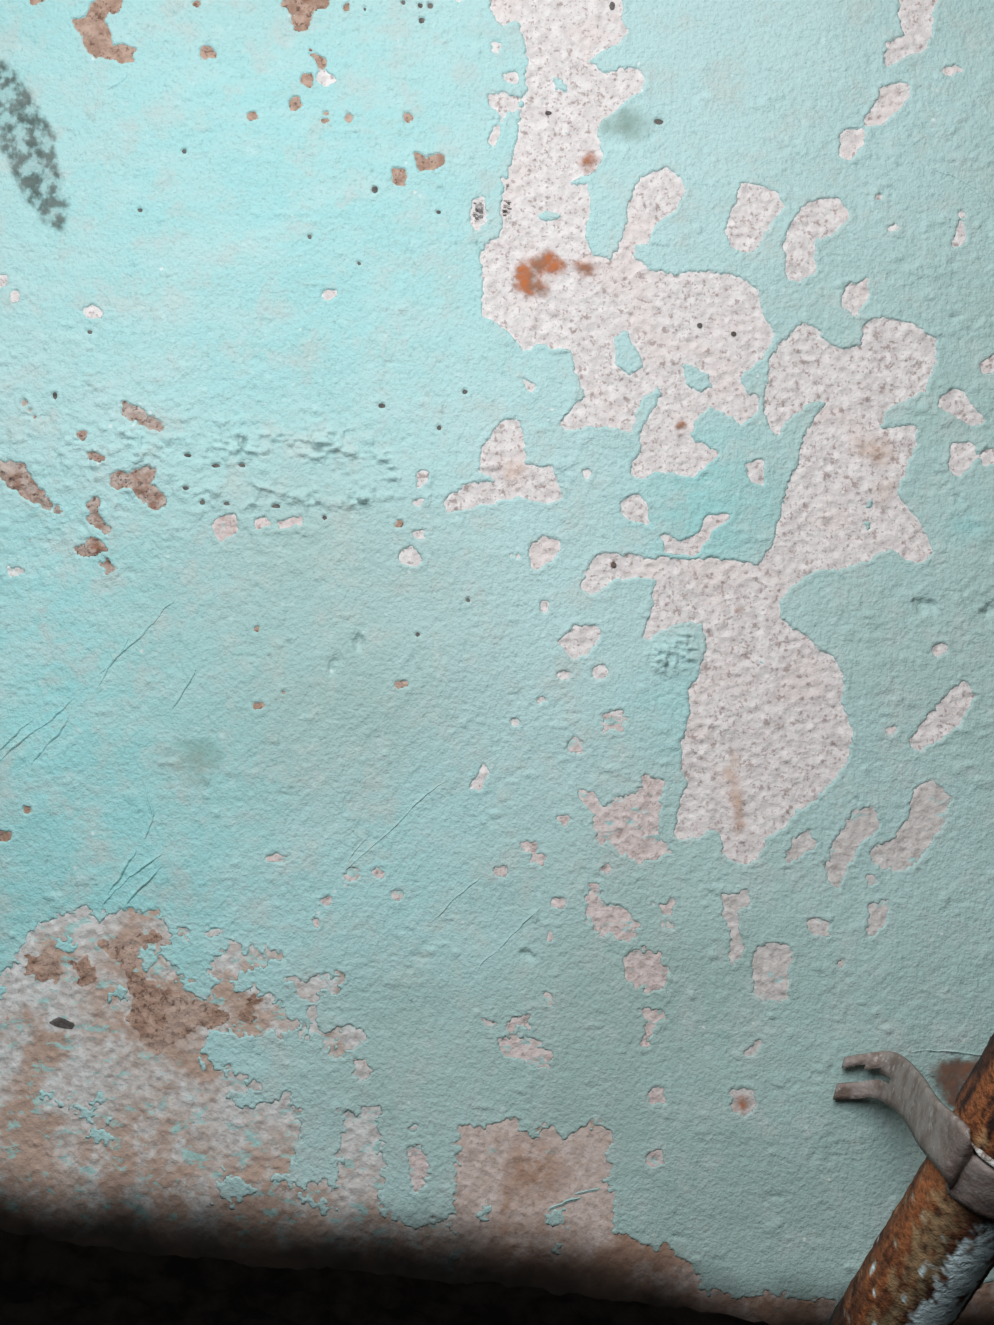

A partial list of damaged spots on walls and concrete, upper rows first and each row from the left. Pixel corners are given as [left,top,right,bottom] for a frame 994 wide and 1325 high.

peeling [72,0,137,64]
peeling [281,0,366,32]
peeling [289,48,336,111]
mould [0,62,66,228]
peeling [392,152,445,186]
rust [515,252,593,294]
peeling [444,417,562,513]
peeling [948,442,994,476]
peeling [470,0,953,1047]
peeling [885,681,975,751]
peeling [0,905,836,1311]
rust [936,1059,977,1106]